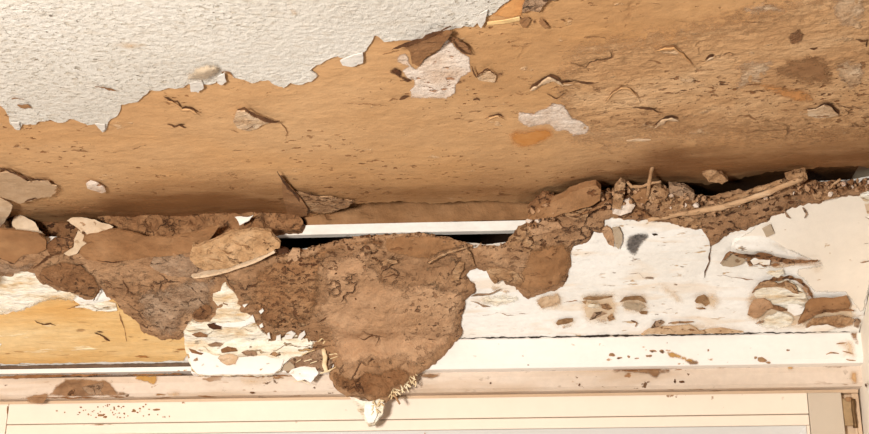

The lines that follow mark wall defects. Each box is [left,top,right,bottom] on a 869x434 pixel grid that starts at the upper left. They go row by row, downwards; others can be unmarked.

peeling [0,0,869,247]
flaking render [0,208,648,427]
peeling [609,350,698,364]
peeling [748,275,861,361]